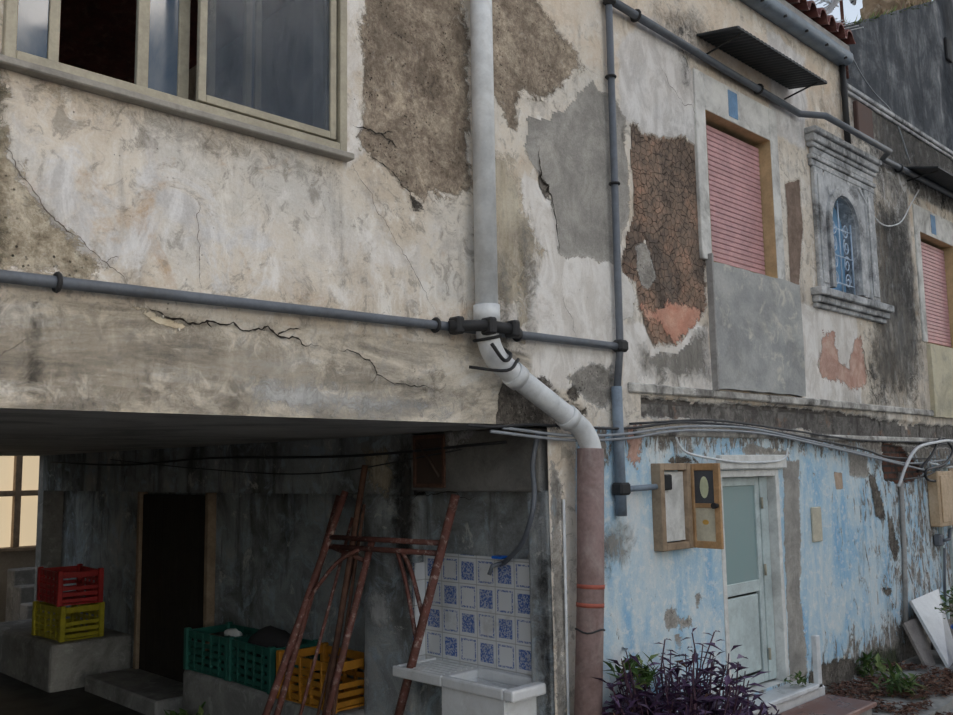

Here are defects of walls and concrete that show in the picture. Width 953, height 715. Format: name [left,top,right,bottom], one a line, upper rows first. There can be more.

flaking render [356,0,473,211]
flaking render [492,0,582,131]
crack [3,139,125,280]
crack [194,199,202,284]
crack [352,125,428,299]
crack [538,152,560,254]
flaking render [621,123,708,349]
crack [147,306,314,347]
crack [336,349,436,394]
peeling [818,330,867,391]
flaking render [742,441,861,688]
flaking render [834,442,924,561]